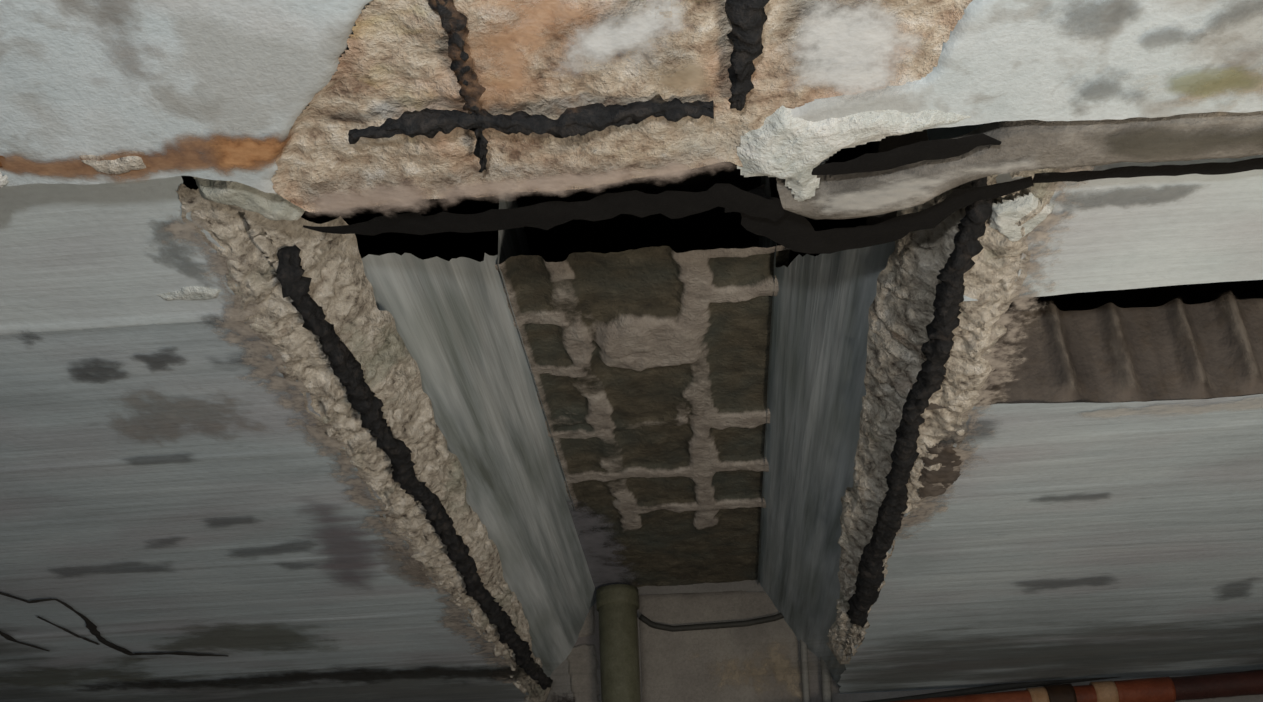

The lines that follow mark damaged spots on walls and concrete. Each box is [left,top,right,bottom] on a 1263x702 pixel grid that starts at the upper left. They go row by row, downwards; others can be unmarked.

corrosion [0,135,292,181]
damp [72,361,124,383]
damp [136,350,182,370]
spalling [156,0,972,702]
spalling [776,111,1263,664]
crack [0,592,229,657]
damp [84,667,526,691]